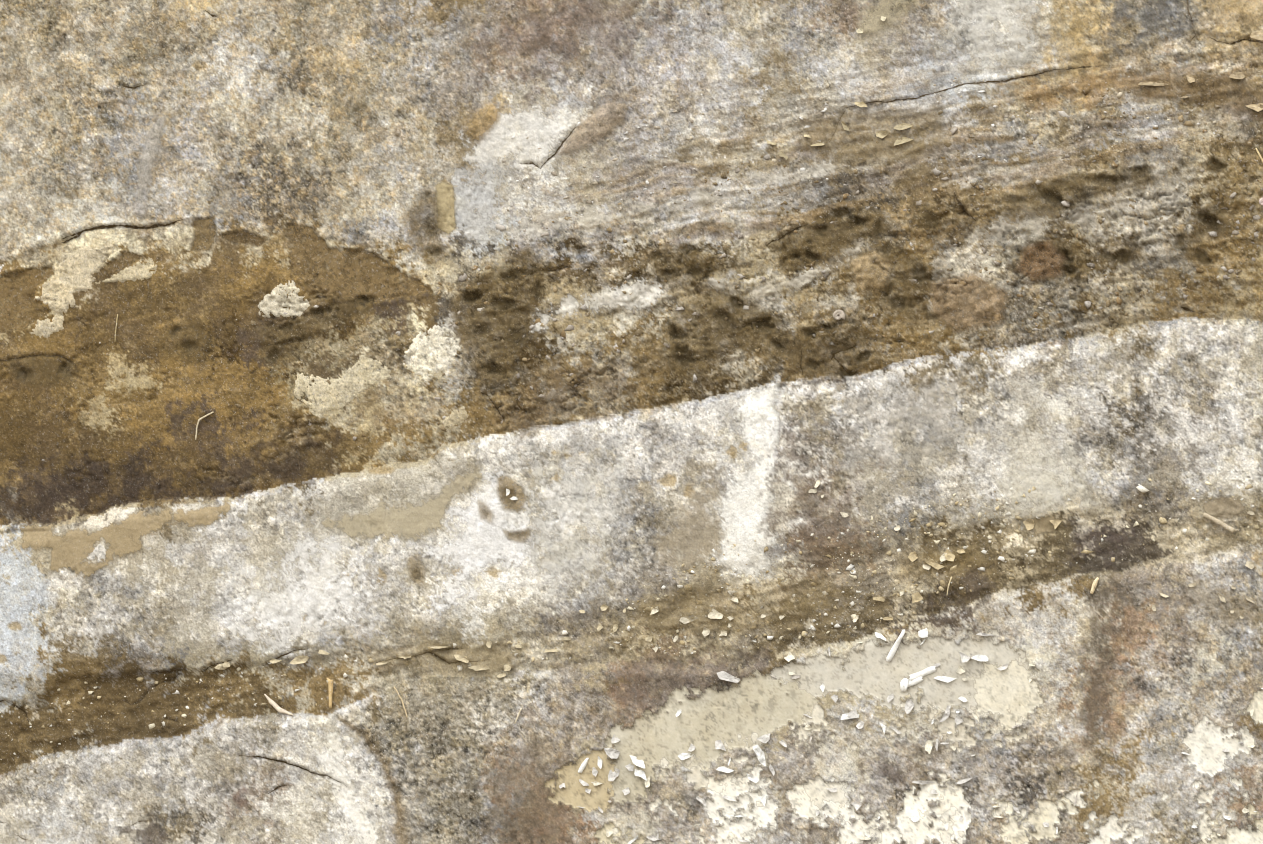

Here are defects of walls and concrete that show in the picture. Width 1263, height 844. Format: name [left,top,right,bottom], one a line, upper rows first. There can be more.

crack [829,65,1109,143]
crack [62,220,180,243]
peeling [908,549,965,570]
peeling [900,591,923,603]
peeling [597,604,627,633]
peeling [673,596,739,642]
peeling [270,650,330,664]
peeling [430,646,512,678]
peeling [545,617,1043,844]
crack [239,755,346,794]
peeling [1182,688,1263,844]
peeling [992,780,1168,844]